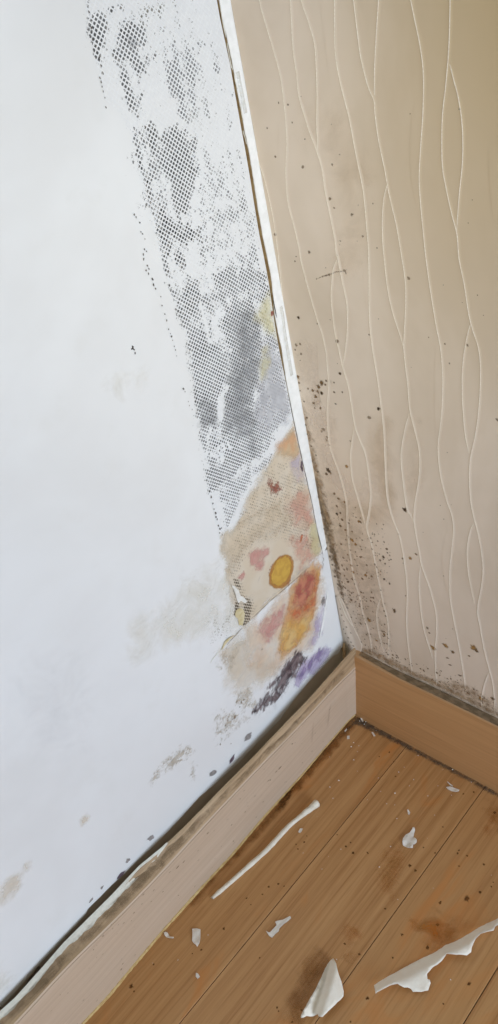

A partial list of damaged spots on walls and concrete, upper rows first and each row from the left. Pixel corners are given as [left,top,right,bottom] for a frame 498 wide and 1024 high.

leakage [86,2,497,714]
peeling [232,585,247,625]
leakage [107,841,180,914]